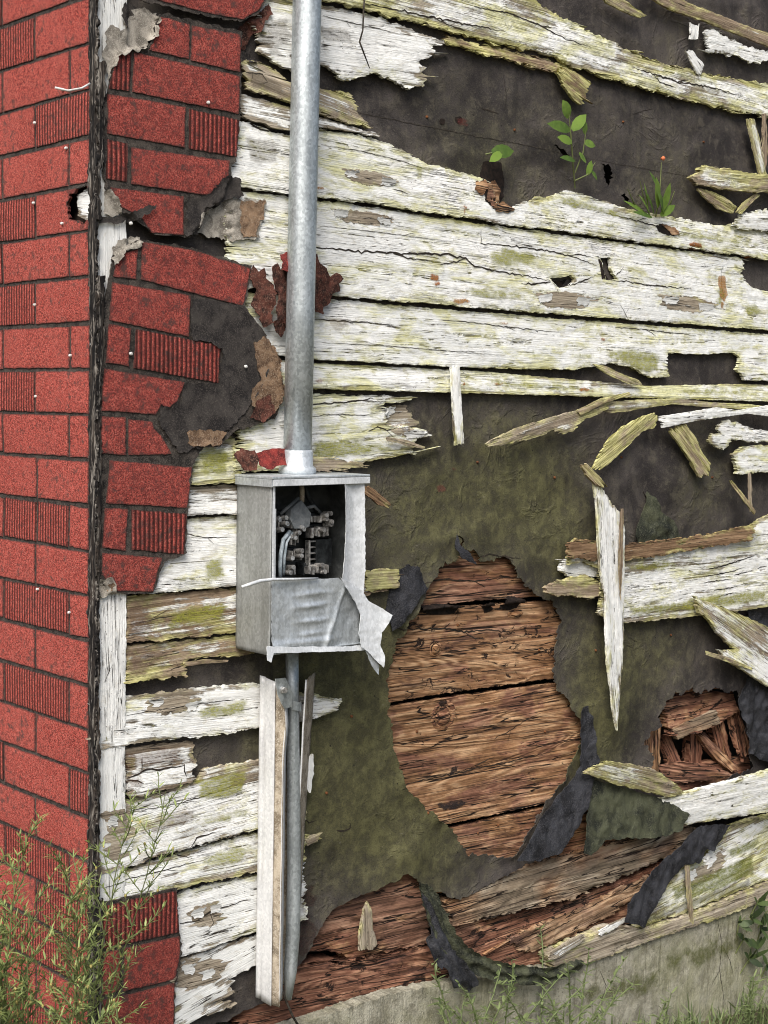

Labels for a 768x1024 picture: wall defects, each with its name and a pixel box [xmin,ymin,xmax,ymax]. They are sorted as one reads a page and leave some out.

peeling [342,168,399,186]
spalling [475,179,515,213]
peeling [330,208,394,226]
crack [316,226,695,336]
peeling [382,405,427,439]
peeling [144,696,202,716]
peeling [186,901,227,927]
peeling [169,957,233,991]